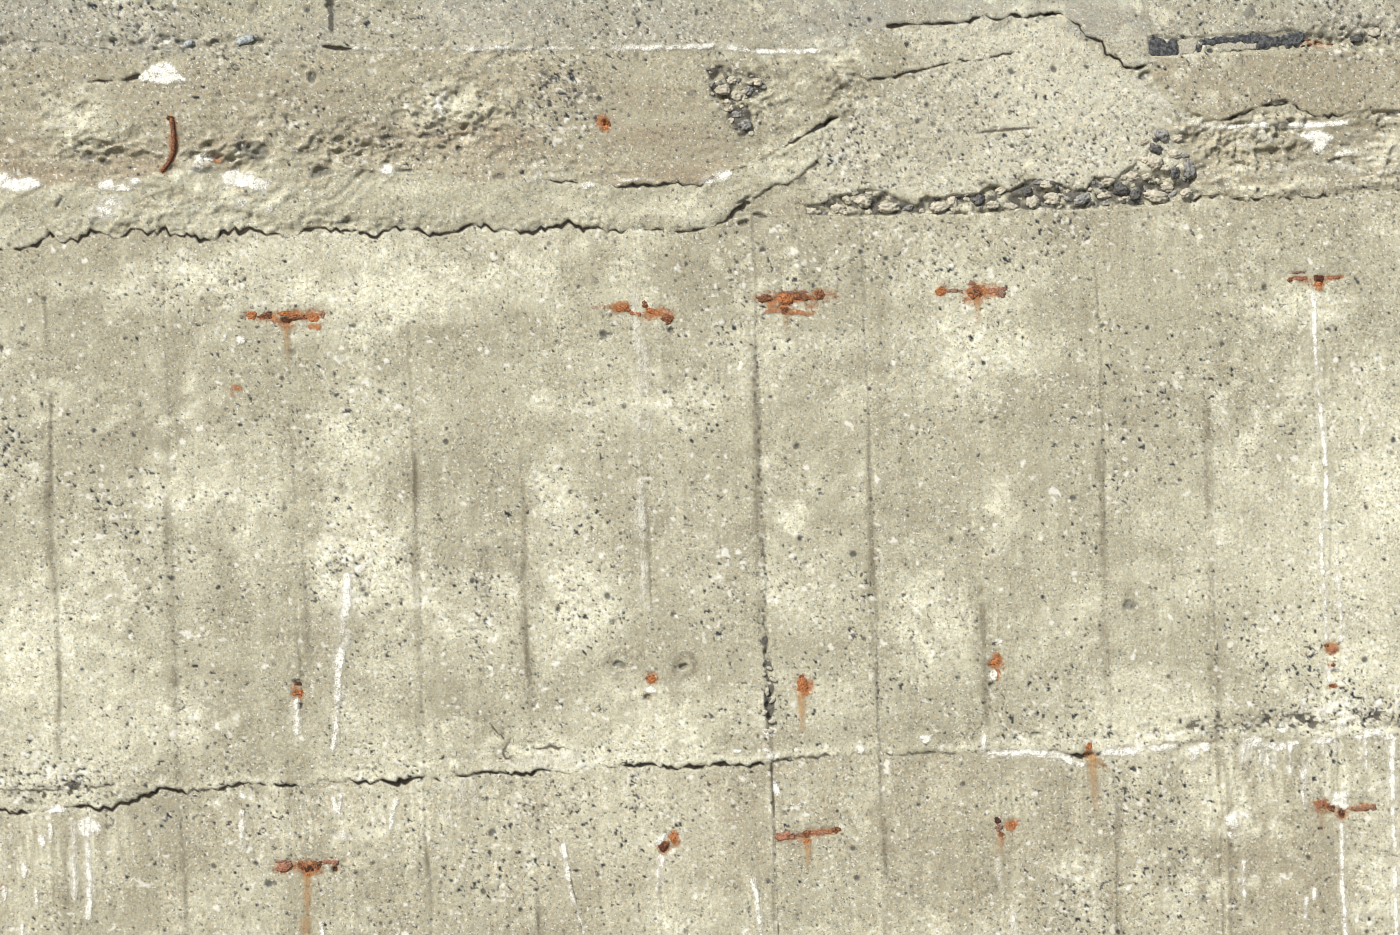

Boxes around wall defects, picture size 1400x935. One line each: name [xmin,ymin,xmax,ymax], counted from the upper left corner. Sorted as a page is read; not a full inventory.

crack [886,12,1146,70]
crack [867,52,1012,81]
spalling [805,5,1400,205]
crack [0,117,838,251]
rust [259,309,323,341]
rust [604,301,673,320]
rust [765,289,835,316]
rust [963,283,1001,309]
rust [796,674,814,717]
crack [352,726,563,787]
crack [0,782,298,815]
crack [610,754,829,814]